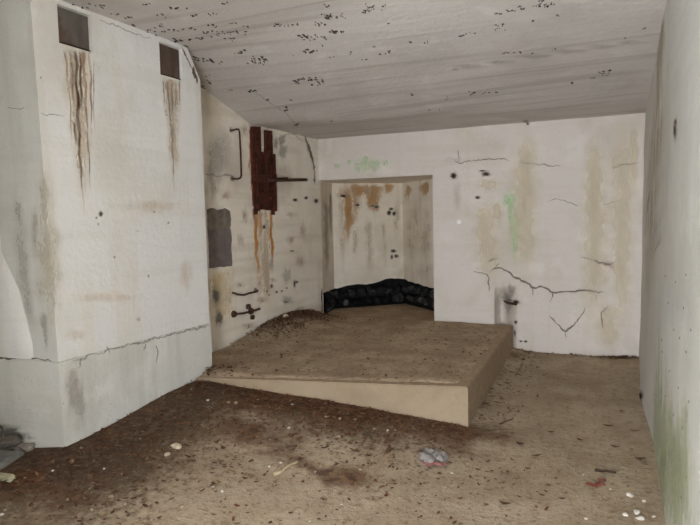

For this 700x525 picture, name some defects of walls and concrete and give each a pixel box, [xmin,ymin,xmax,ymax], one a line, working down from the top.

crack [455,152,559,167]
corrosion [253,208,274,291]
crack [477,258,607,336]
crack [79,326,202,367]